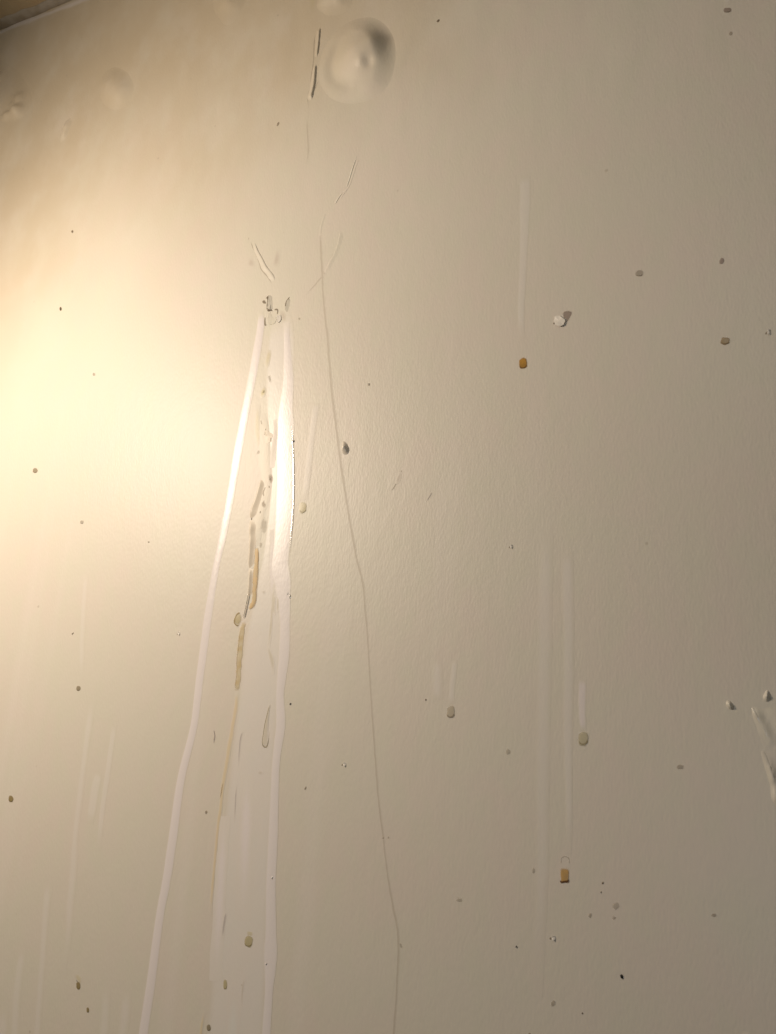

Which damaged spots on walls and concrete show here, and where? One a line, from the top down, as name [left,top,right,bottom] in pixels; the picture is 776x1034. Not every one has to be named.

water stain [138,307,295,1034]
crack [305,214,400,1034]